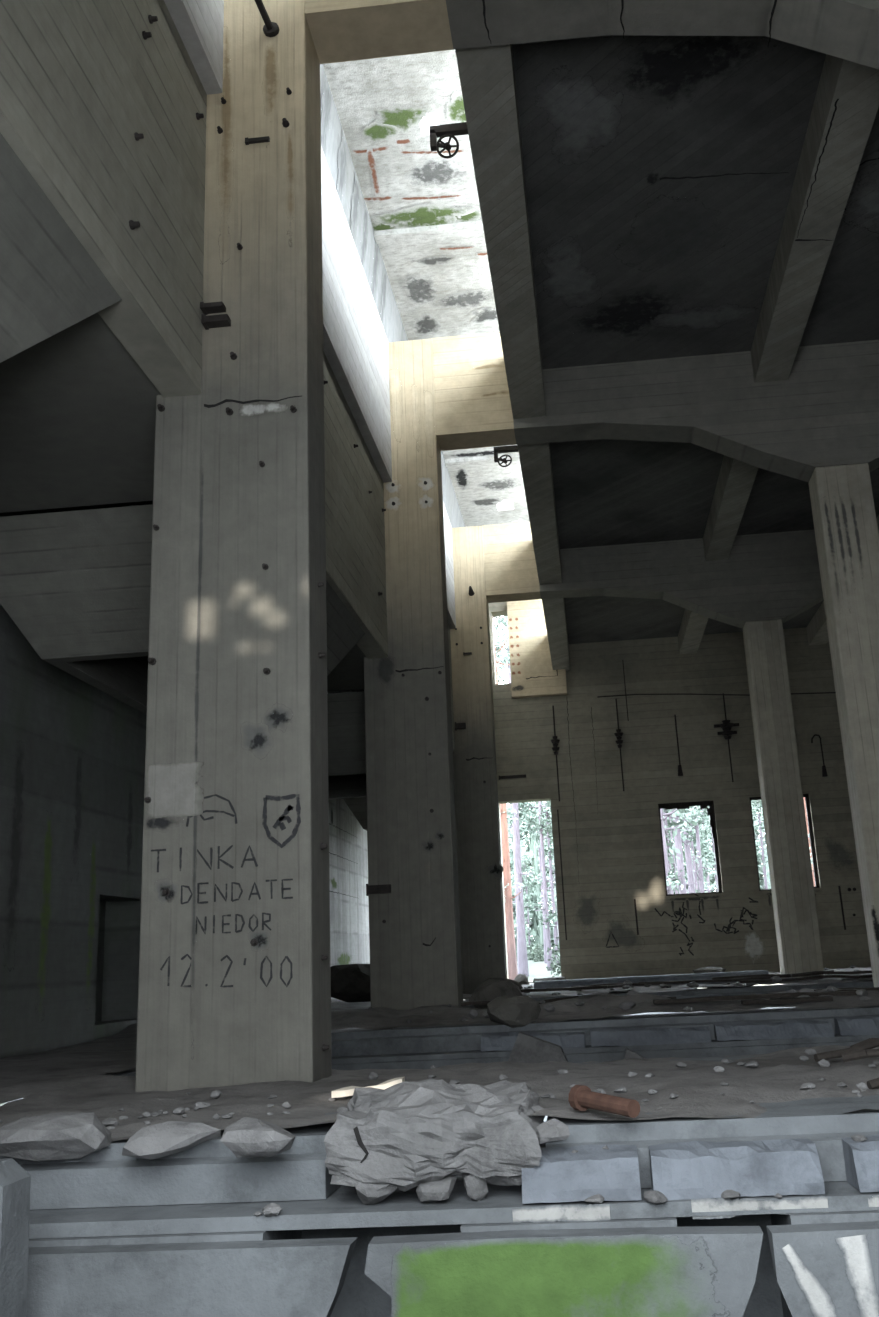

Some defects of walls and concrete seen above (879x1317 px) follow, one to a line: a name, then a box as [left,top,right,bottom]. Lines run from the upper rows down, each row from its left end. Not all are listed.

leakage [321,80,498,336]
crack [204,396,301,408]